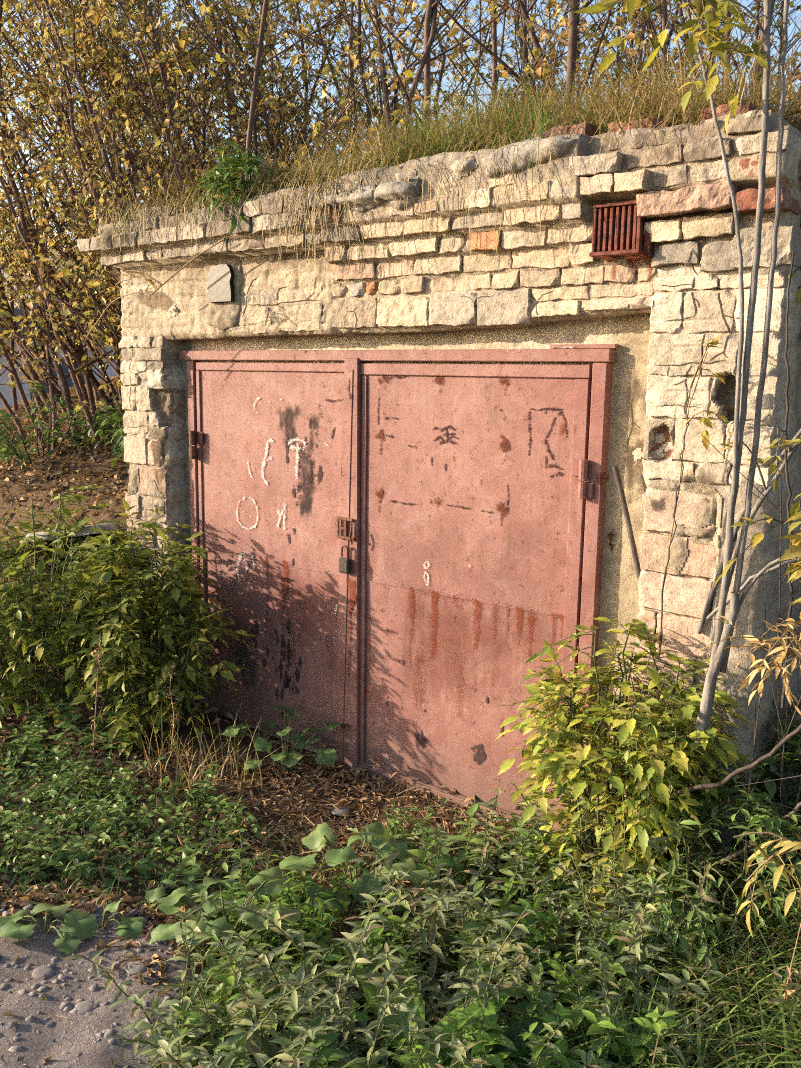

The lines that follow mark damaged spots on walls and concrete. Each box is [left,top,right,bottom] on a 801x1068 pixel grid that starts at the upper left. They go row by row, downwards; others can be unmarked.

spalling [712,369,742,434]
peeling [286,446,322,505]
spalling [632,425,674,511]
spalling [668,488,722,574]
corrosion [348,579,358,676]
corrosion [473,599,481,647]
corrosion [493,606,533,656]
peeling [249,617,303,718]
peeling [414,731,428,749]
peeling [470,743,485,764]